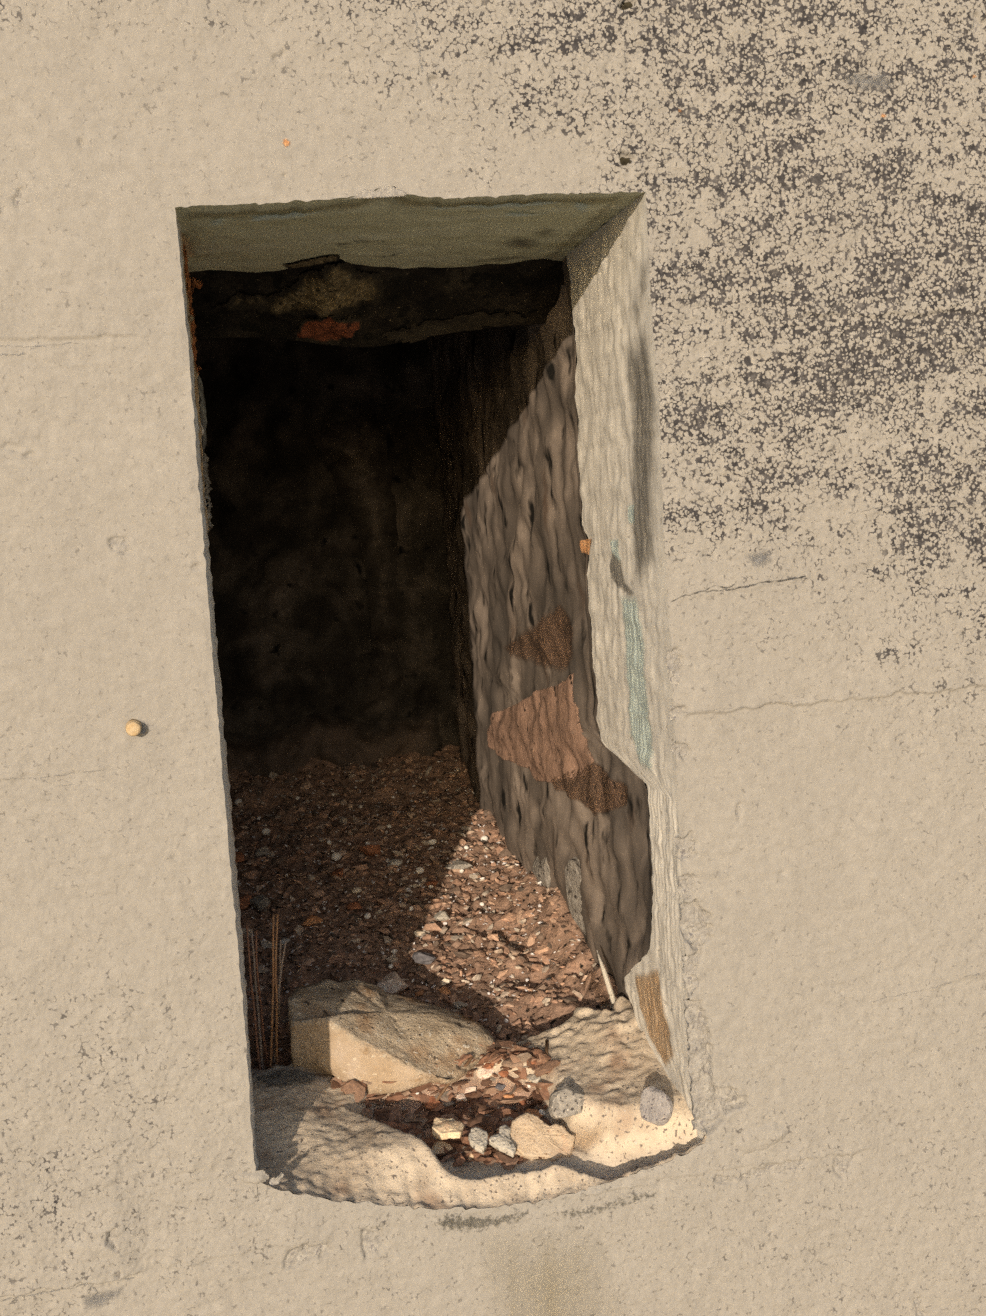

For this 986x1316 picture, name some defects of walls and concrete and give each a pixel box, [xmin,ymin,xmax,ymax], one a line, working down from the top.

corrosion [181,234,208,521]
spalling [677,874,750,1133]